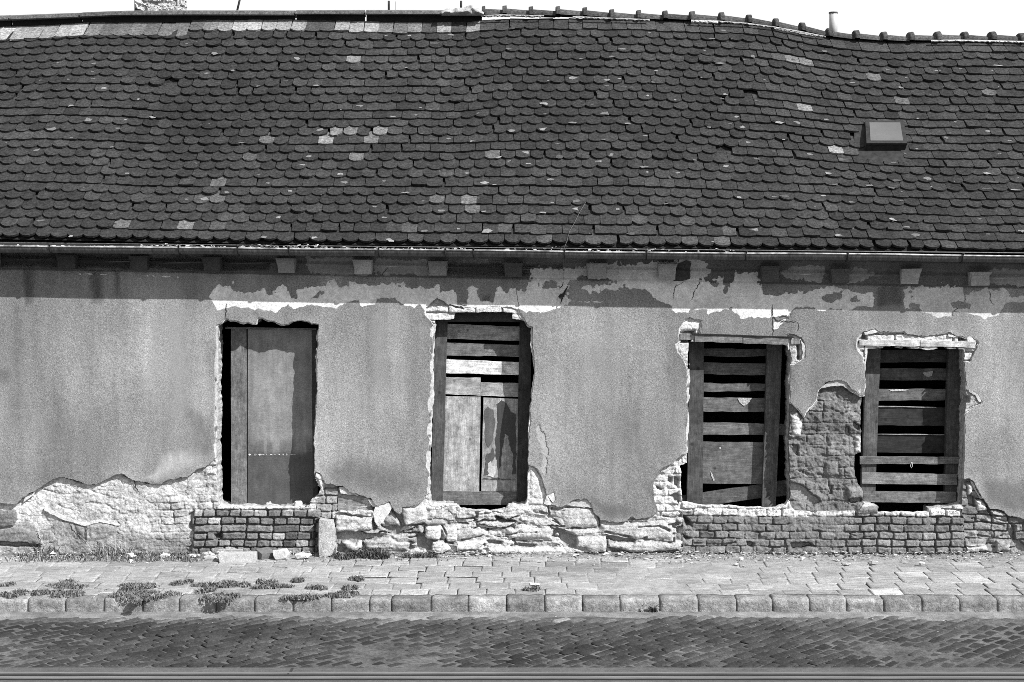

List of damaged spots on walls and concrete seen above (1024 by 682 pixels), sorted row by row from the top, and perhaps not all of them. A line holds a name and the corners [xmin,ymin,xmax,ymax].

peeling [209,256,881,368]
flaking render [857,329,977,361]
peeling [903,268,1024,319]
flaking render [0,381,1024,555]